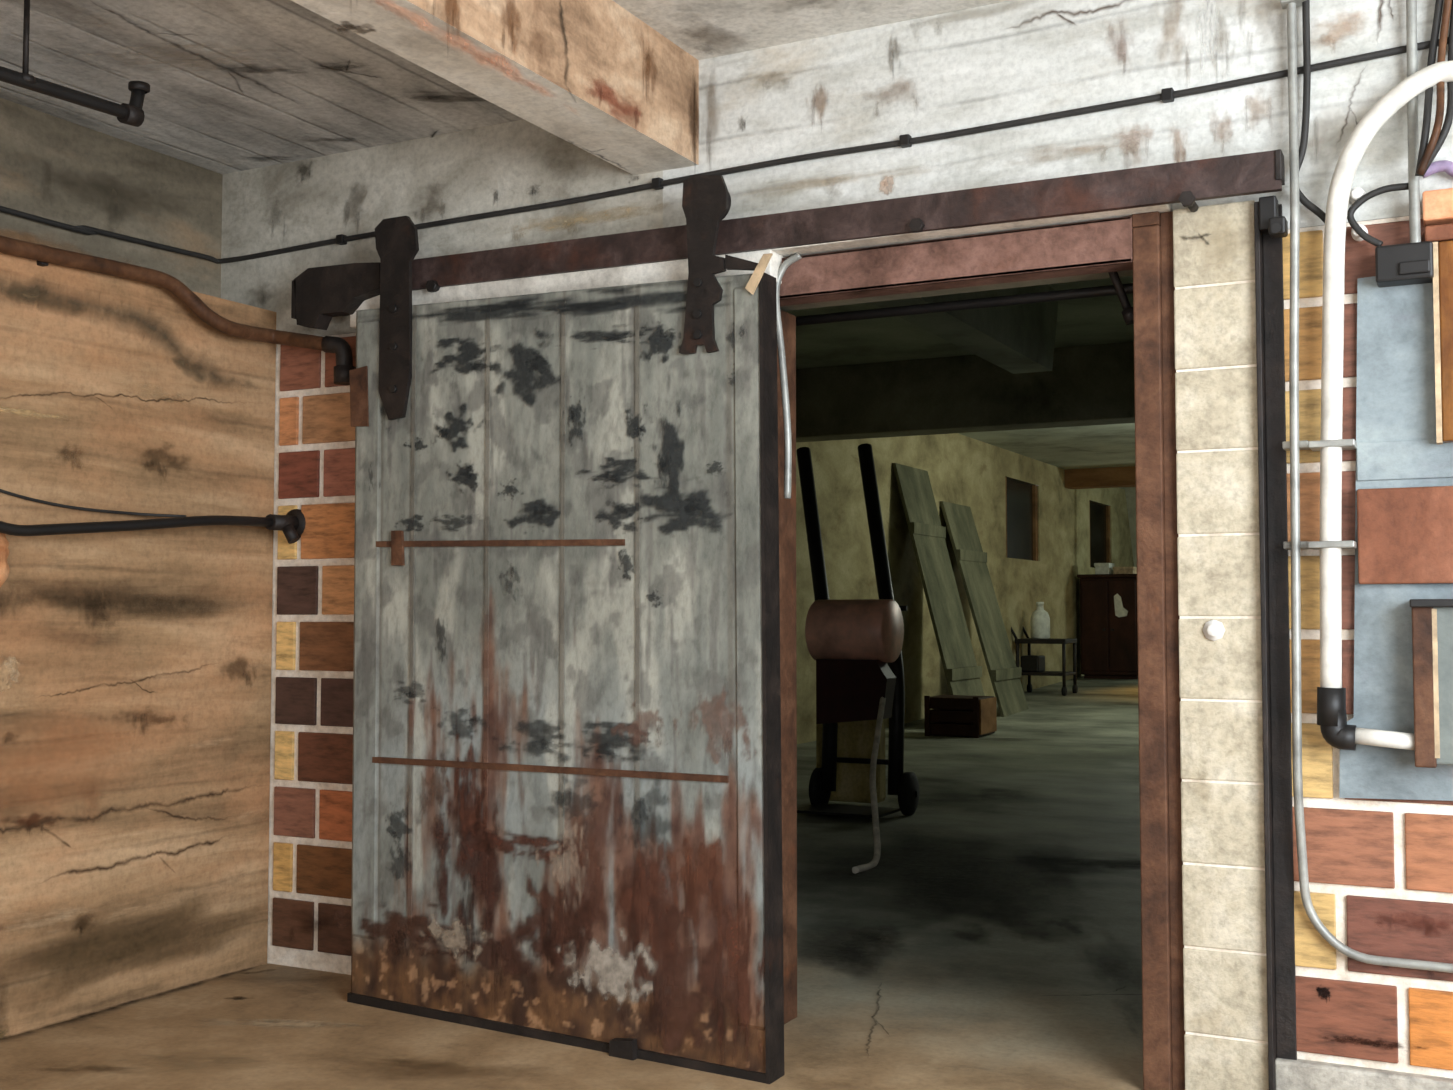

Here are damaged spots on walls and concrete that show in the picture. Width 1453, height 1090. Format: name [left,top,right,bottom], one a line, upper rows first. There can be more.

crack [1029,4,1120,24]
crack [1379,0,1393,28]
crack [0,791,226,873]